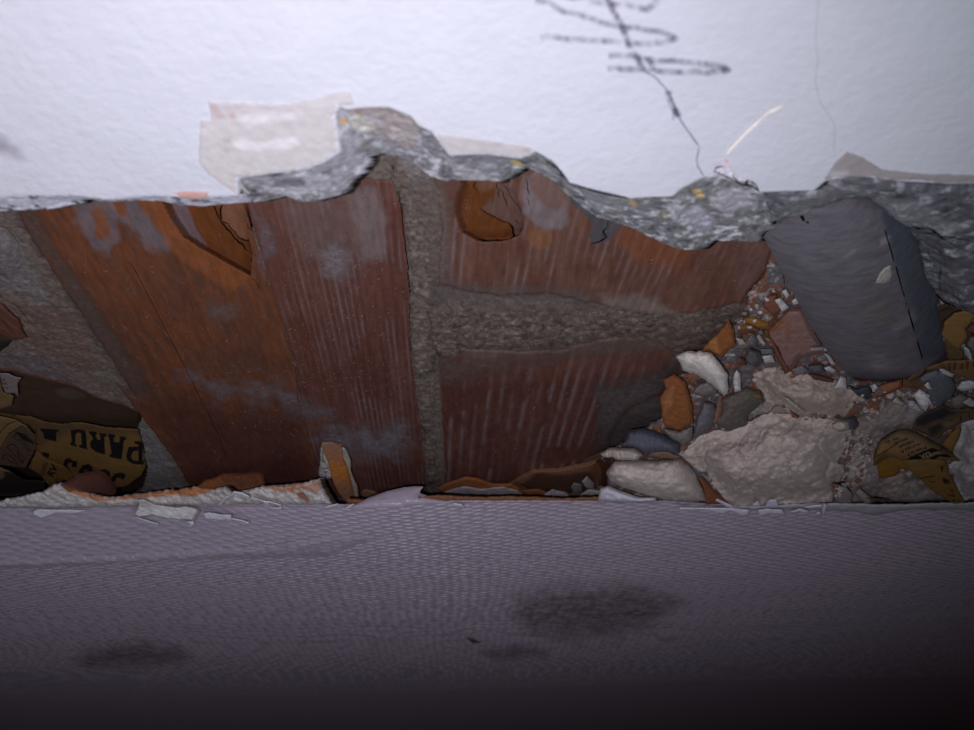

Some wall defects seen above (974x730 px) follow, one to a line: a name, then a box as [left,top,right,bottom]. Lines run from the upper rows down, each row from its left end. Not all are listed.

crack [643,70,706,178]
peeling [0,91,781,250]
peeling [824,152,974,184]
spalling [775,289,799,312]
spalling [733,369,742,392]
spalling [736,335,776,364]
spalling [810,346,848,389]
spalling [907,382,932,412]
spalling [939,368,974,407]
peeling [185,491,282,528]